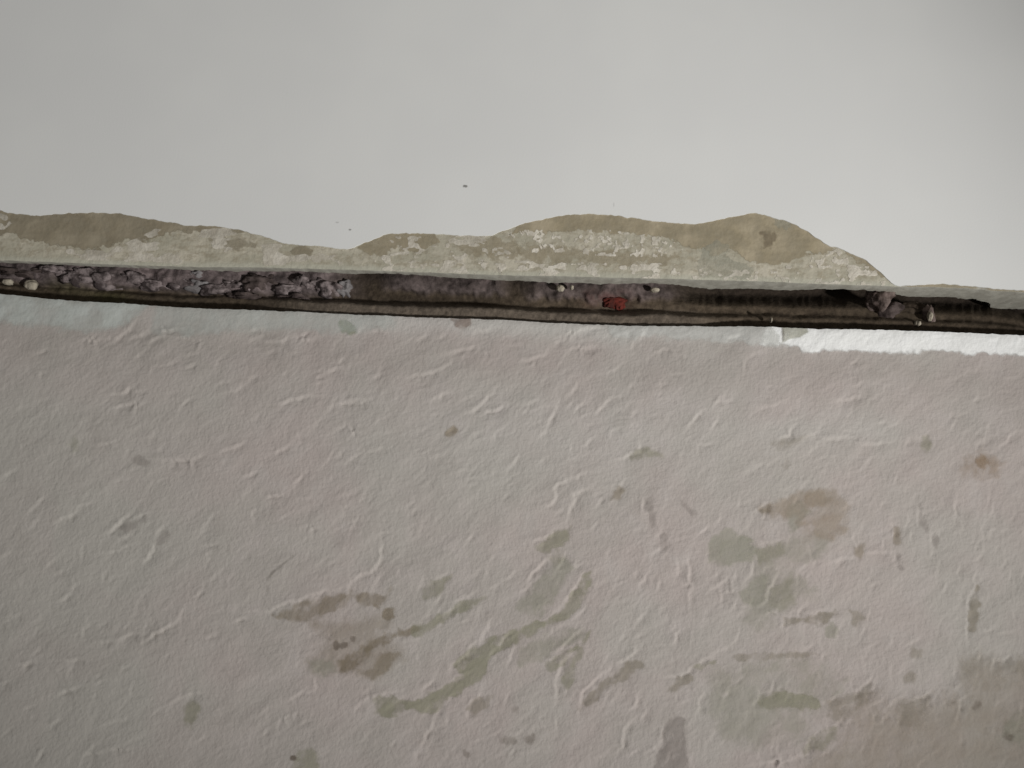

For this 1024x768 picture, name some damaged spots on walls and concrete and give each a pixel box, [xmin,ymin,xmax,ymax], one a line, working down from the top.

peeling [0,210,973,288]